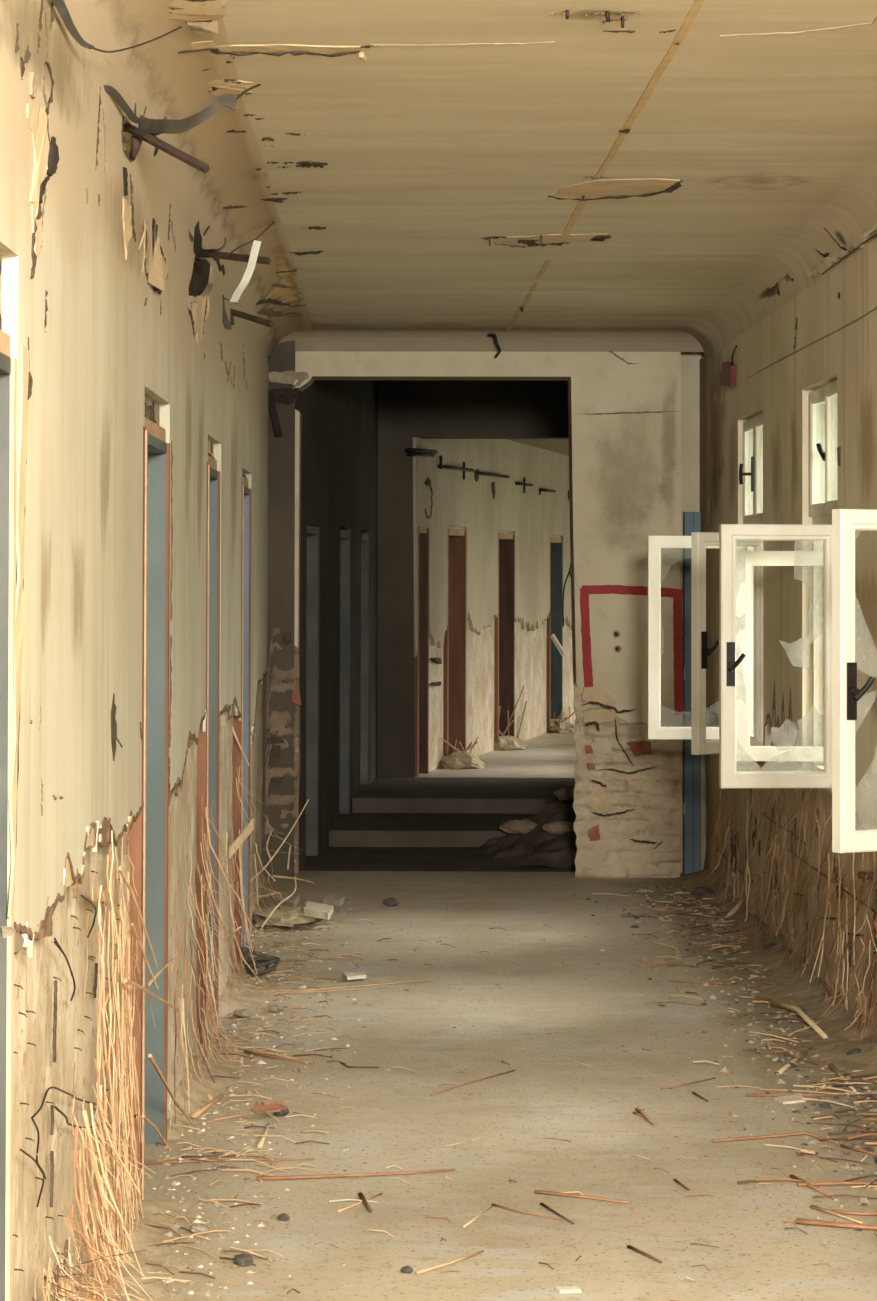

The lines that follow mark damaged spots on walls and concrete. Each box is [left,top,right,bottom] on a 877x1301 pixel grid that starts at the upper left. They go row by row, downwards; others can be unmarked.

spalling [15,0,54,80]
crack [178,41,555,61]
crack [720,16,877,36]
spalling [95,87,106,173]
peeling [117,0,328,389]
peeling [548,176,683,201]
peeling [481,233,611,248]
flaking render [1,337,144,1301]
flaking render [573,682,682,878]